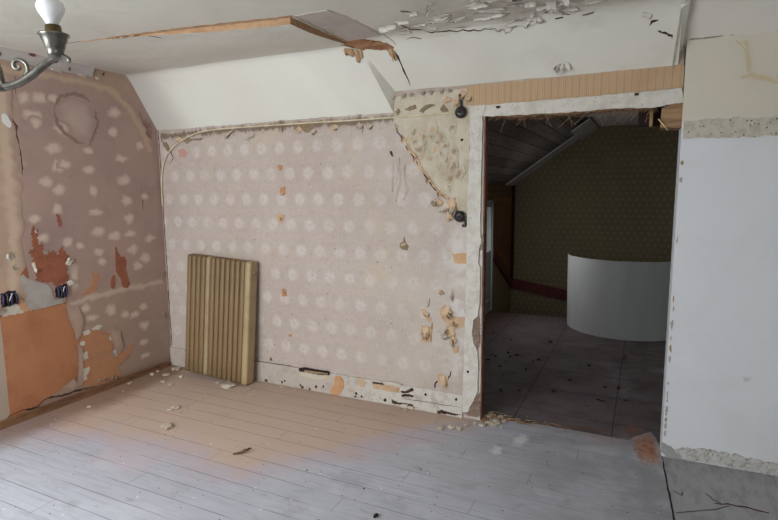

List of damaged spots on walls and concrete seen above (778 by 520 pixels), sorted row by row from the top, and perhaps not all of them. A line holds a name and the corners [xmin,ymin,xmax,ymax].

peeling [293,0,652,63]
flaking render [160,88,471,222]
spalling [683,116,778,139]
peeling [0,227,134,417]
spalling [420,289,481,354]
peeling [295,372,344,395]
peeling [354,378,415,409]
spalling [437,393,480,417]
flaking render [661,382,778,477]